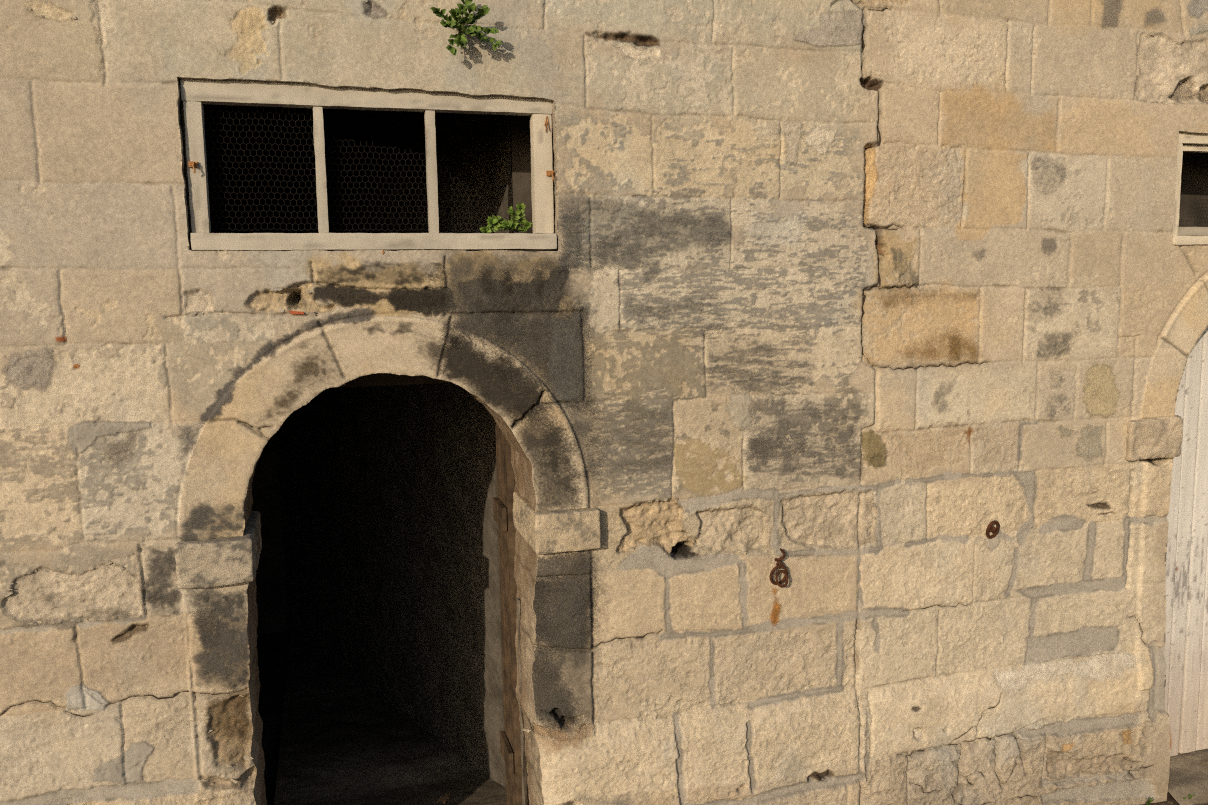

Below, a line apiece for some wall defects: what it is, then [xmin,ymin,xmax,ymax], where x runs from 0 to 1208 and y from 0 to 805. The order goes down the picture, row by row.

spalling [1135,33,1208,104]
spalling [617,491,878,555]
rust [770,589,781,623]
crack [0,690,242,717]
crack [900,700,1037,805]